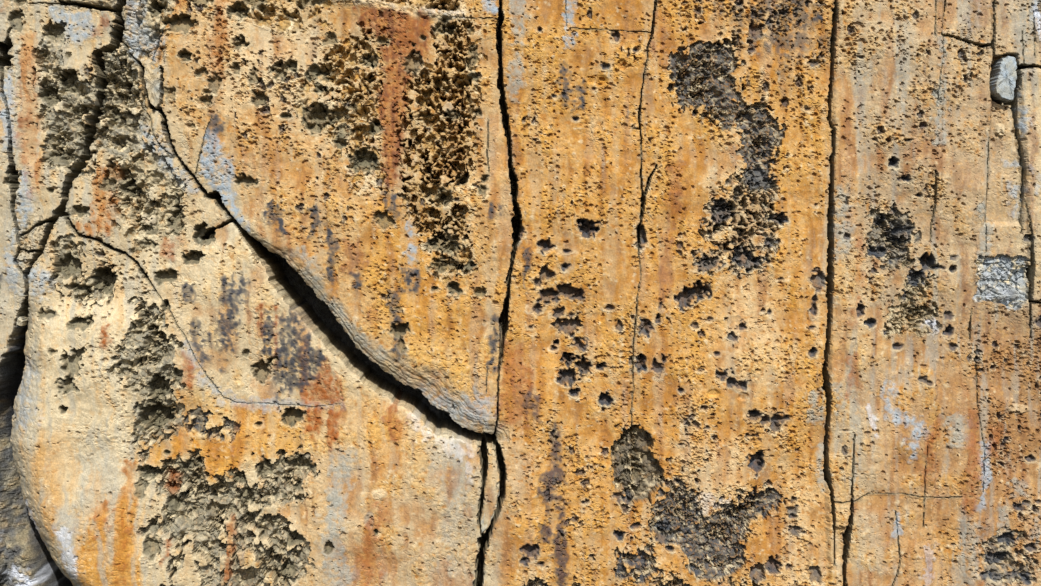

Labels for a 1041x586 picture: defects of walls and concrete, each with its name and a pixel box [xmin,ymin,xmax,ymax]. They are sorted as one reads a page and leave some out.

water stain [2,499,85,586]
rust [90,456,141,586]
spalling [33,22,336,586]
crack [0,0,523,586]
spalling [142,0,491,299]
rust [351,5,434,191]
rust [487,339,547,437]
crack [565,0,659,426]
spalling [602,39,791,382]
spalling [609,424,807,586]
crack [821,0,987,586]
crack [934,0,1041,338]